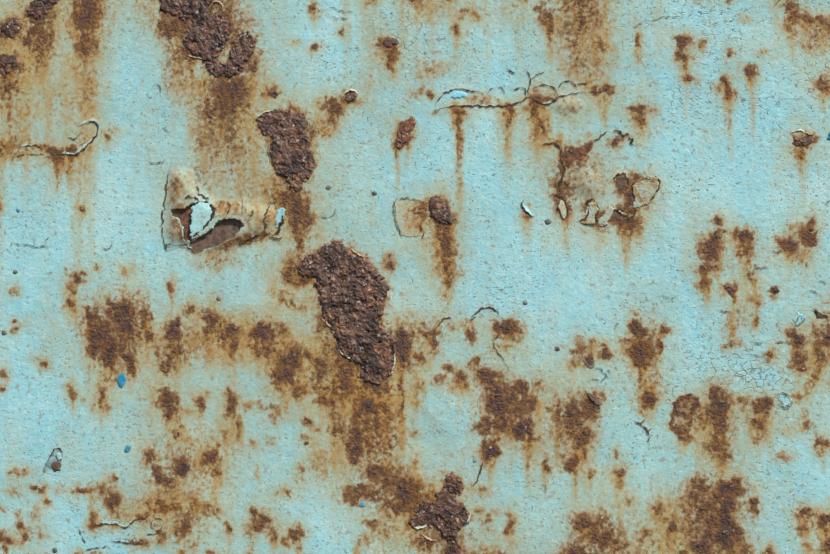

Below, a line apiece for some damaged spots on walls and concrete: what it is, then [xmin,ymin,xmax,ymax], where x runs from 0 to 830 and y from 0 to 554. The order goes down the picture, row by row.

crack [0,116,102,157]
corrosion [0,0,115,214]
peeling [161,165,286,271]
peeling [393,196,430,238]
crack [435,66,609,111]
corrosion [448,88,653,261]
peeling [544,130,634,220]
peeling [579,170,661,227]
corrosion [63,0,619,554]
corrosion [693,214,780,349]
corrosion [567,310,674,416]
corrosion [555,379,779,554]